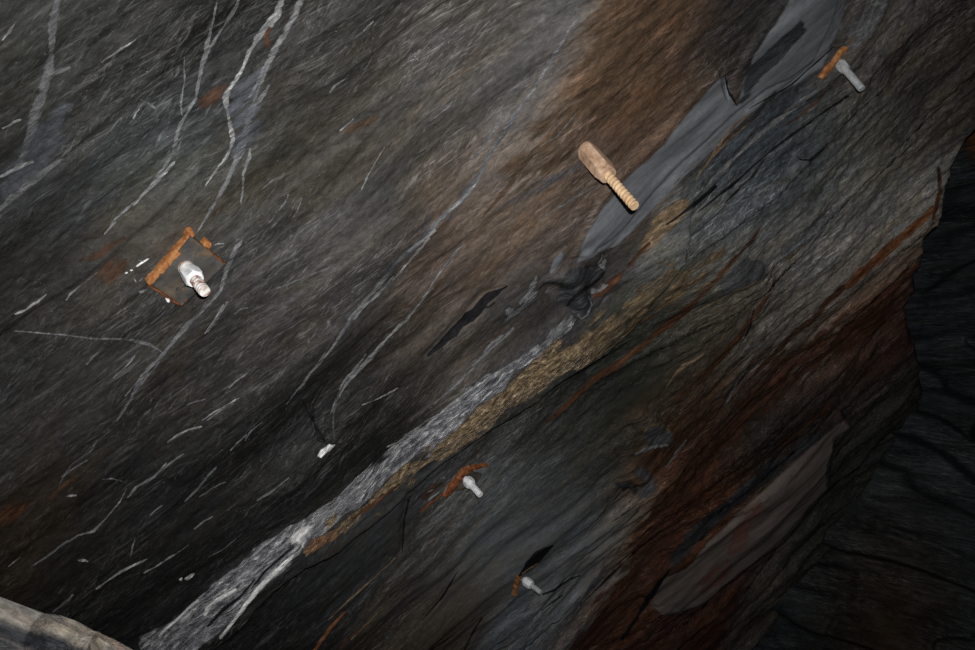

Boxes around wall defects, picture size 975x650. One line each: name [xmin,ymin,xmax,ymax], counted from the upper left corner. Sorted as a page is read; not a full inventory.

corrosion [818,46,849,80]
corrosion [145,235,189,306]
crack [427,286,507,356]
corrosion [421,468,470,512]